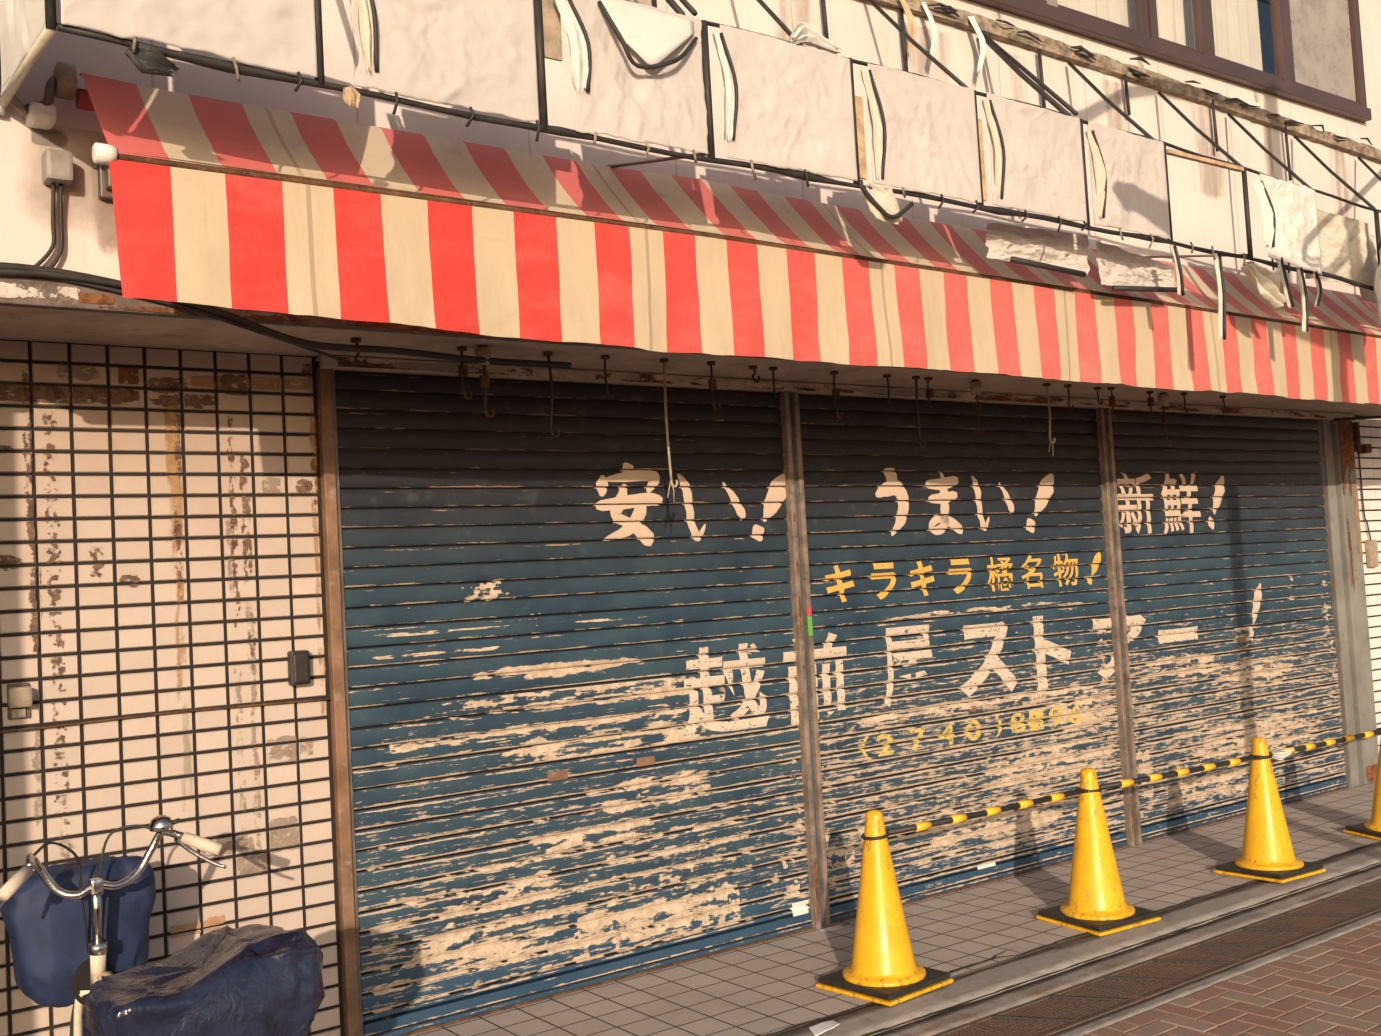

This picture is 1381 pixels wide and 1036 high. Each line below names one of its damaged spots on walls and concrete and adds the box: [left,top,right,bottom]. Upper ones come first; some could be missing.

peeling [0,282,114,304]
rust [0,364,313,602]
rust [310,417,321,591]
rust [1337,420,1362,587]
peeling [457,580,517,603]
peeling [377,657,707,766]
peeling [881,602,1083,622]
peeling [857,628,1119,870]
peeling [1125,599,1302,719]
peeling [1136,708,1331,809]
peeling [369,770,753,1014]
peeling [771,804,809,917]